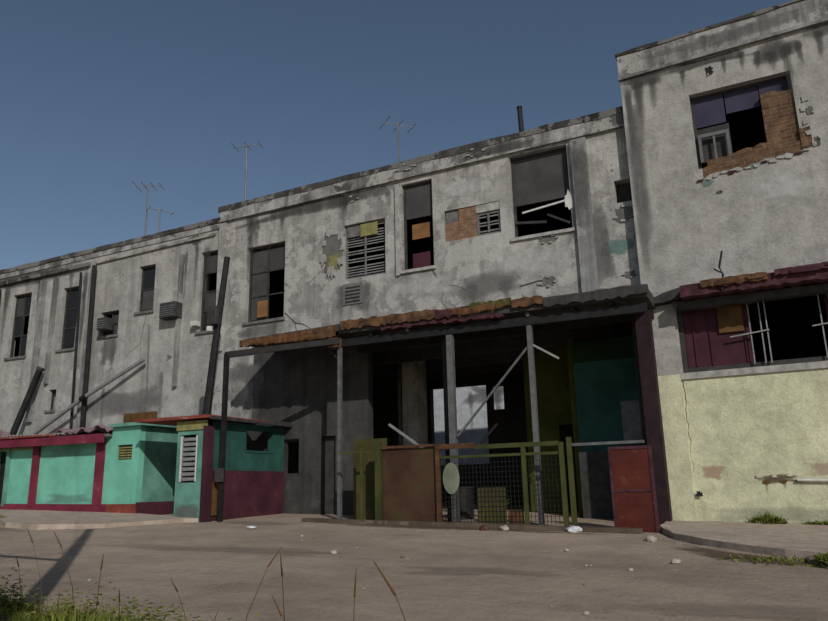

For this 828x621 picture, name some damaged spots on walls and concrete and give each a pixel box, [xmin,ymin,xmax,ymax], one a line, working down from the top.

water stain [681,17,778,49]
water stain [812,23,828,45]
water stain [670,51,743,78]
water stain [755,40,801,63]
spalling [697,95,821,194]
spalling [320,228,345,279]
peeling [704,467,723,479]
peeling [756,474,801,485]